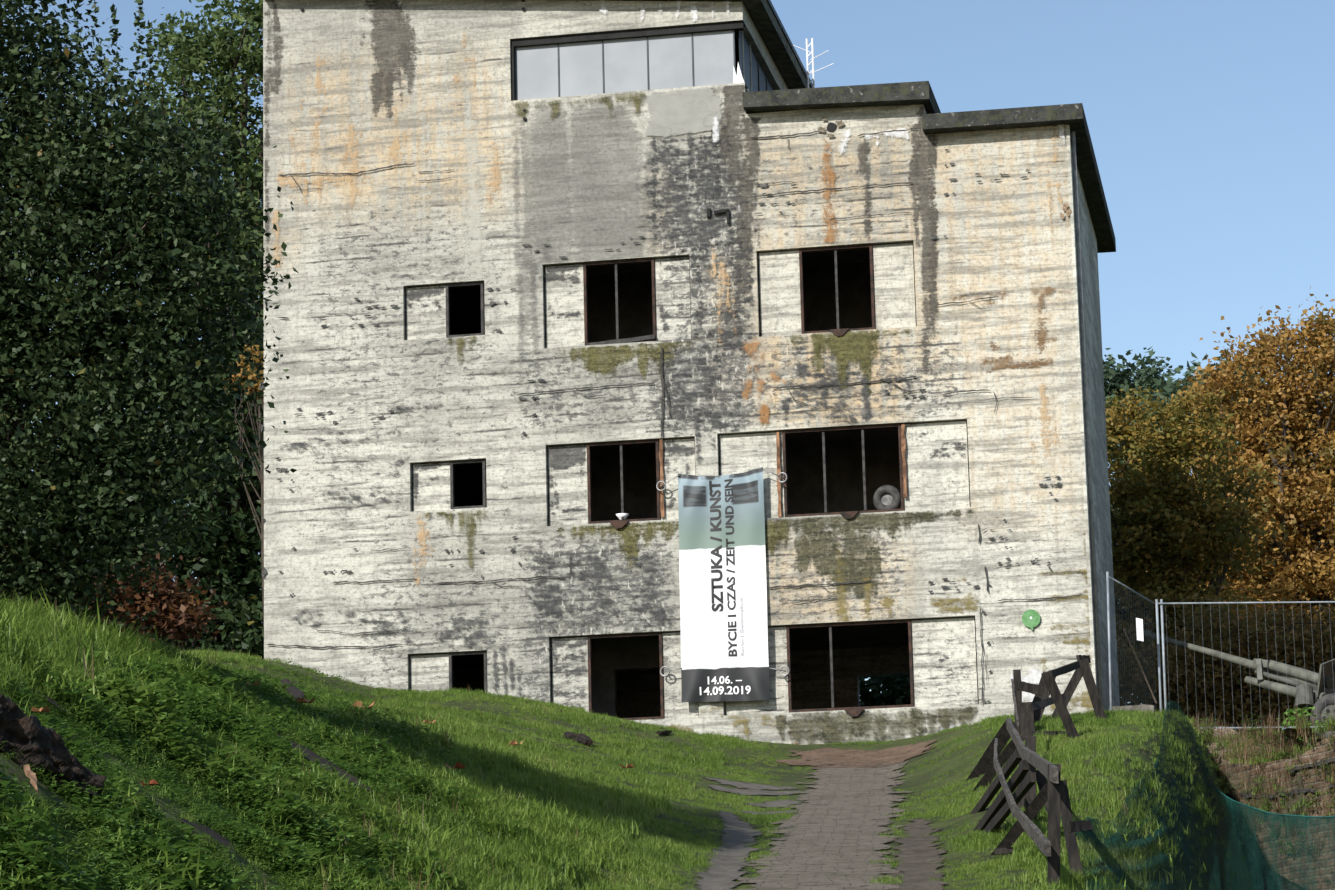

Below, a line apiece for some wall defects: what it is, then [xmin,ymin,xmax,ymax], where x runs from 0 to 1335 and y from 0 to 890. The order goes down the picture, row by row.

damp [362,0,420,118]
corrosion [822,141,837,243]
damp [570,85,761,464]
damp [779,106,938,425]
damp [765,509,963,618]